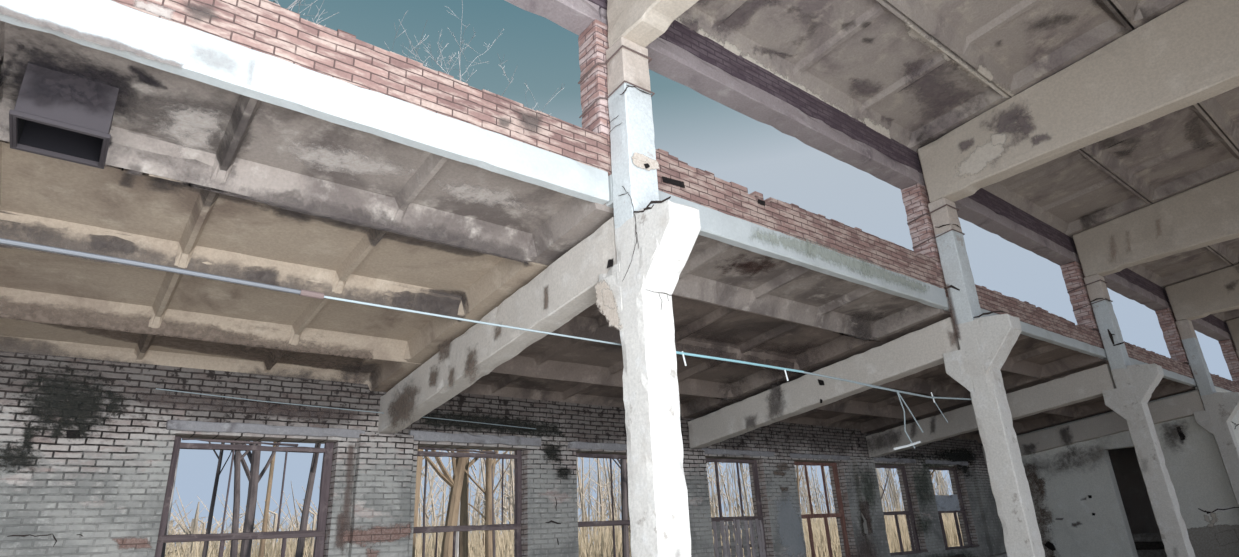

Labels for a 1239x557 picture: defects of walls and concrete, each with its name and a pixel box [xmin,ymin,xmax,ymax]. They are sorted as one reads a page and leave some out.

water stain [905,60,974,118]
water stain [20,66,251,171]
water stain [921,124,973,151]
spalling [957,133,1006,177]
water stain [988,107,1050,145]
crack [619,186,674,307]
spalling [595,280,623,329]
water stain [0,298,377,386]
water stain [0,337,128,473]
water stain [1024,444,1054,557]
crack [7,534,83,547]
flaking render [342,524,412,557]